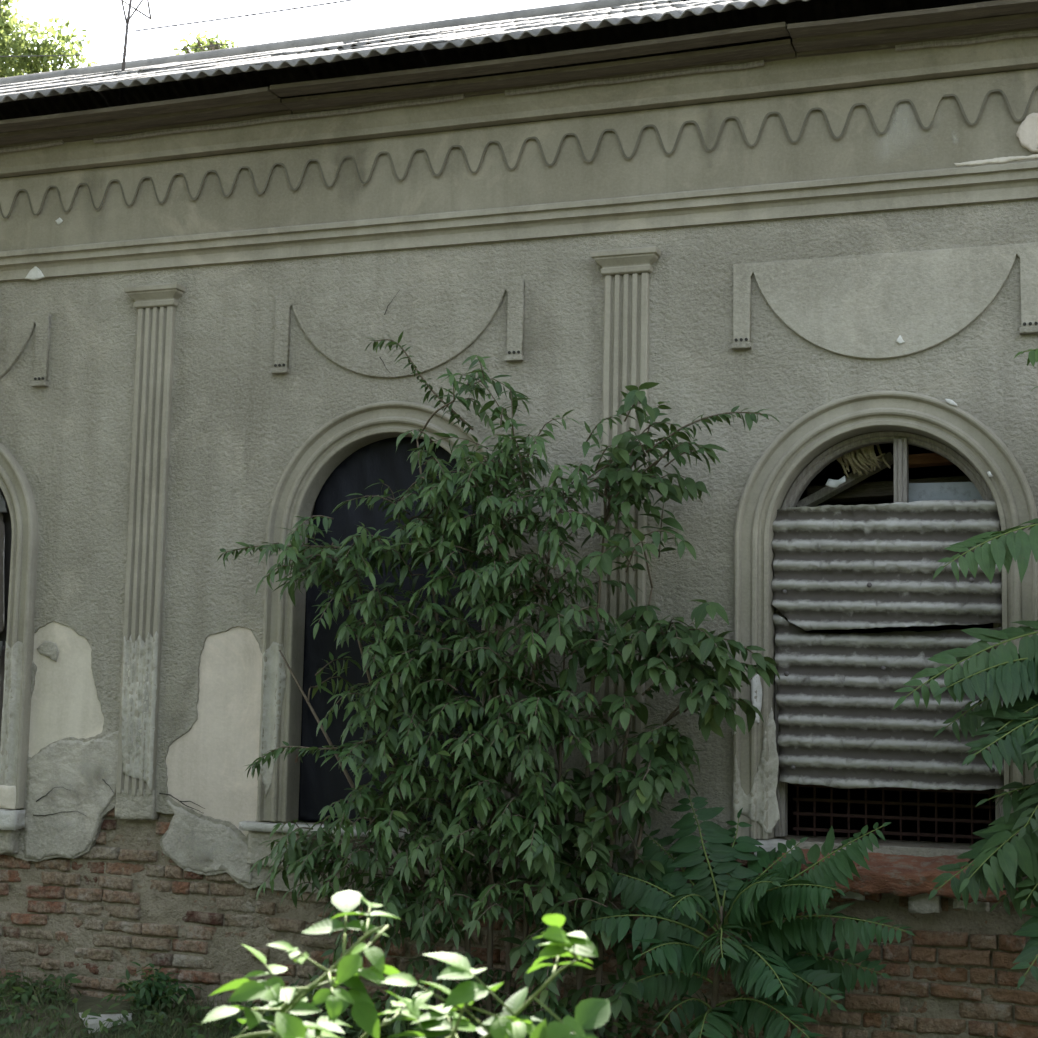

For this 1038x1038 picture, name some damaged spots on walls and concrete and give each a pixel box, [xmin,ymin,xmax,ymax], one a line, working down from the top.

spalling [954,113,1038,167]
flaking render [0,621,104,786]
flaking render [115,626,315,885]
peeling [733,674,795,857]